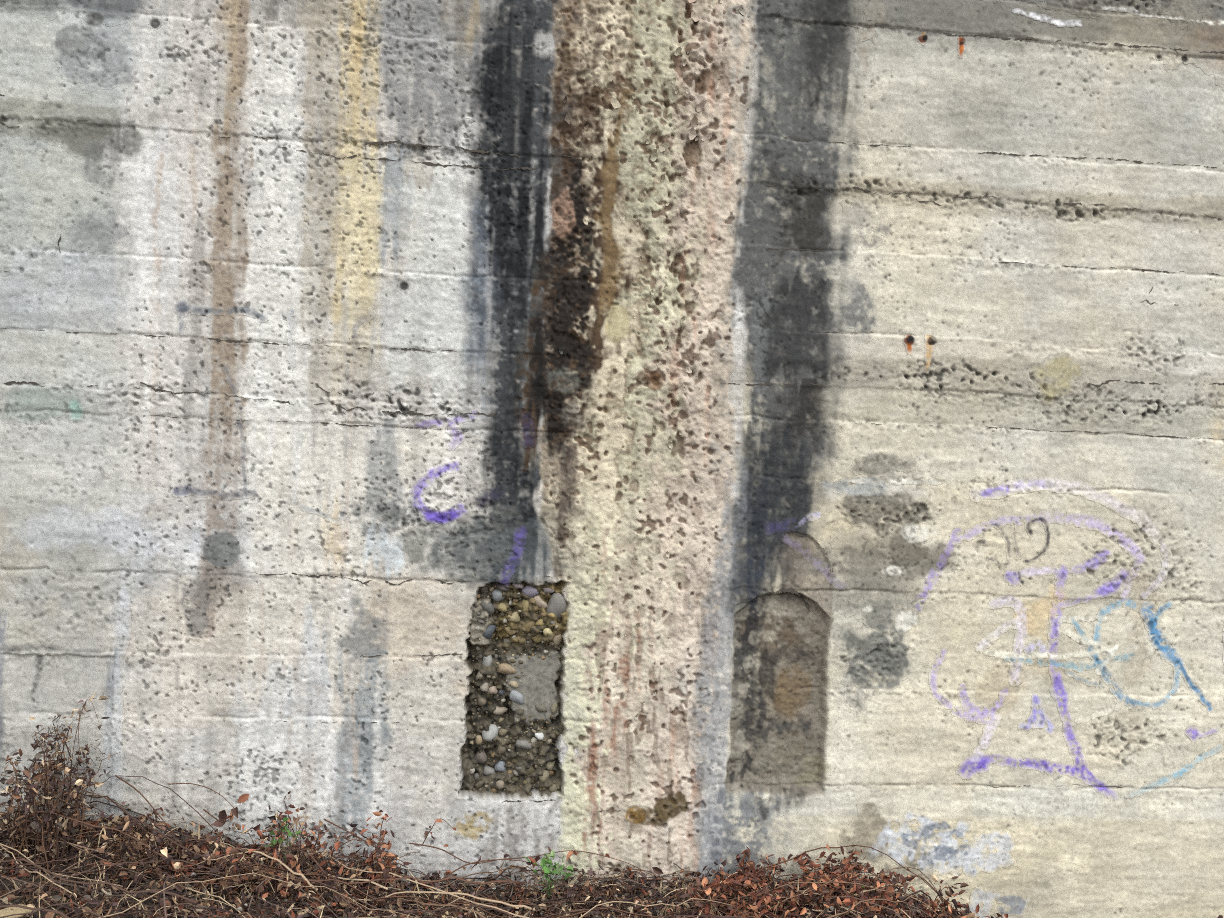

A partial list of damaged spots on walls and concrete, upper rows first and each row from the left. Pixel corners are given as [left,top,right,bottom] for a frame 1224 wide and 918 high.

rust [916,31,929,45]
rust [957,36,967,58]
leakage [0,382,91,426]
leakage [31,0,223,640]
leakage [201,0,640,882]
leakage [685,0,965,889]
rust [903,334,937,374]
leakage [167,659,183,844]
spalling [458,580,571,803]